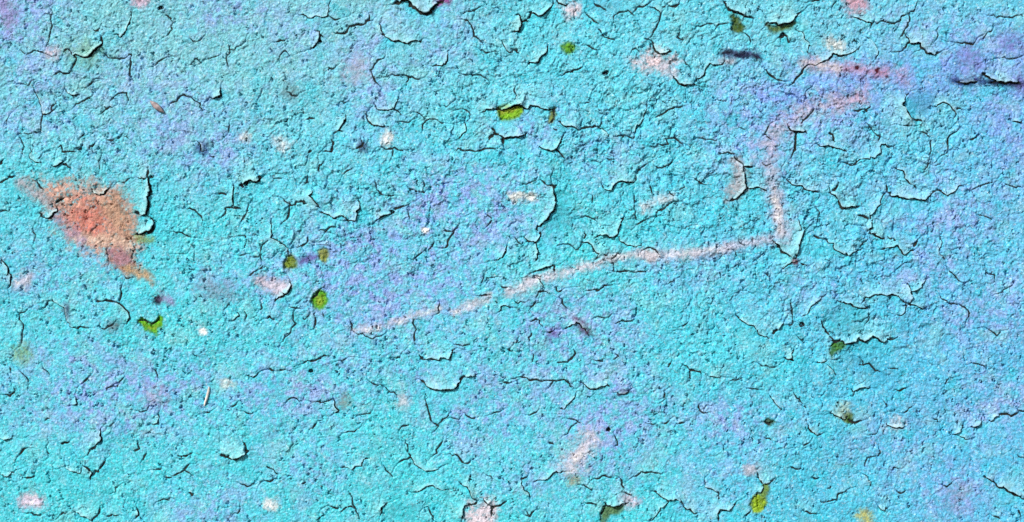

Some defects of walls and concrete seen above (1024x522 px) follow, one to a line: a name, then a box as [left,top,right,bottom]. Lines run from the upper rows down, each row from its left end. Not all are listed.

crack [156,15,241,111]
spalling [561,42,575,53]
spalling [497,106,523,120]
crack [178,0,1019,276]
crack [0,12,160,341]
spalling [139,316,163,336]
crack [226,280,324,341]
spalling [283,255,297,268]
spalling [312,290,328,310]
crack [342,56,1024,521]
crack [0,407,193,521]
spalling [750,484,769,513]